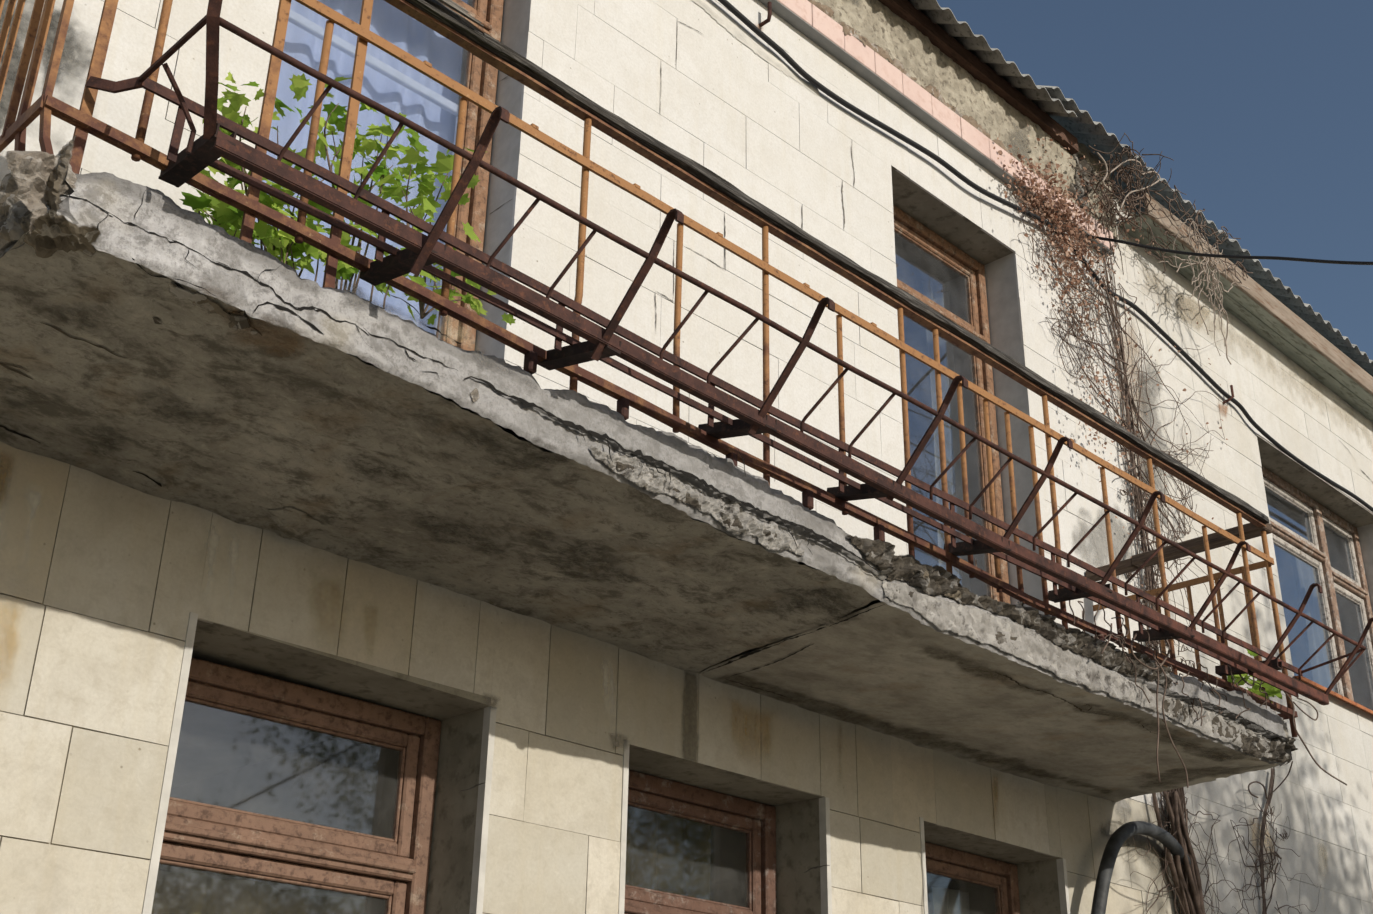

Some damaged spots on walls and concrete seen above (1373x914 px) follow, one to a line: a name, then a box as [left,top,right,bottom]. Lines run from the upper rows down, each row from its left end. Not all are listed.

water stain [0,0,91,128]
flaking render [808,0,1017,159]
spalling [0,135,101,258]
crack [40,322,127,359]
crack [66,190,878,572]
spalling [589,446,804,555]
crack [706,604,885,697]
spalling [847,535,1298,765]